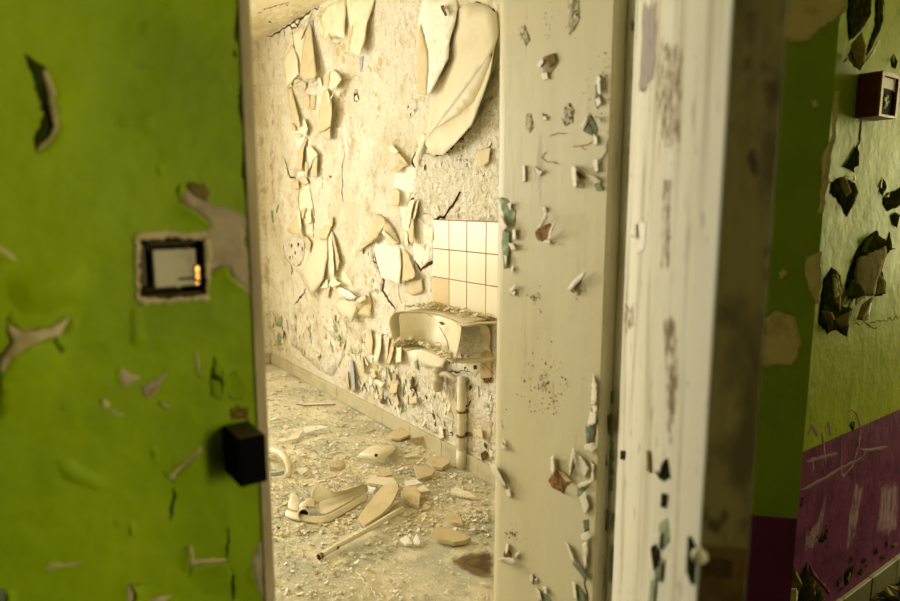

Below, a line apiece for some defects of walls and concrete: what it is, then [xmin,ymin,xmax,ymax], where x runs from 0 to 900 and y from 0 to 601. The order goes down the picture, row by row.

peeling [23,53,116,173]
spalling [537,53,558,80]
peeling [561,75,608,191]
peeling [786,0,884,70]
peeling [813,90,858,217]
peeling [167,182,251,301]
spalling [273,0,516,497]
peeling [535,206,556,245]
peeling [803,177,900,337]
peeling [0,304,95,429]
peeling [548,375,625,601]
peeling [646,450,671,482]